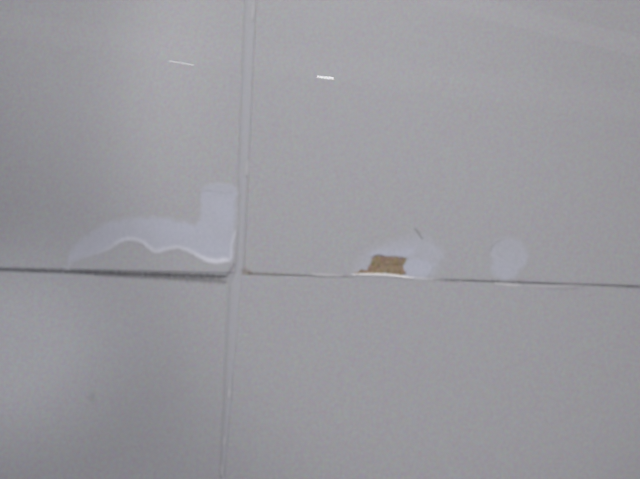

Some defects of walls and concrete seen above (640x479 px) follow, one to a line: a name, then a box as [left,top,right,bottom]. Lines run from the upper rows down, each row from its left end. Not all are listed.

spalling [65,181,240,271]
spalling [347,229,462,284]